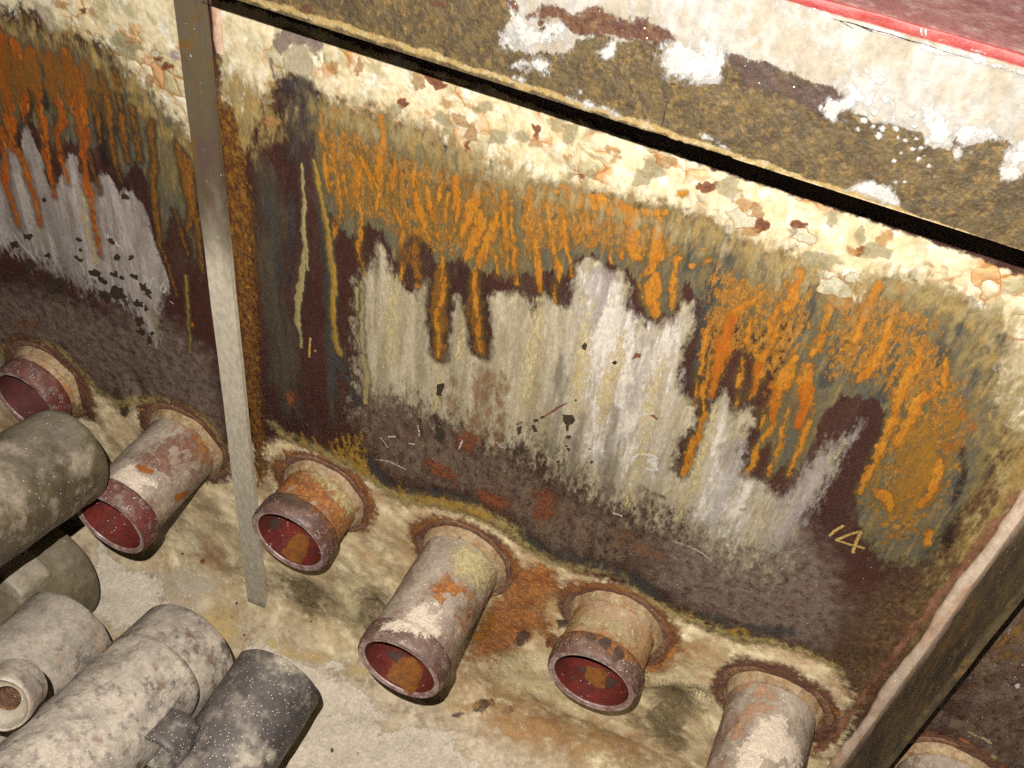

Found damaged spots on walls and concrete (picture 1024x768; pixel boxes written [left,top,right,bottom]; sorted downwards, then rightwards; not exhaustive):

leakage [0,11,203,354]
corrosion [0,27,206,298]
corrosion [281,532,310,564]
corrosion [217,97,379,537]
peeling [433,414,444,444]
corrosion [353,391,700,688]
peeling [556,415,575,463]
leakage [218,60,1024,768]
peeling [219,0,1024,439]
corrosion [312,112,979,547]